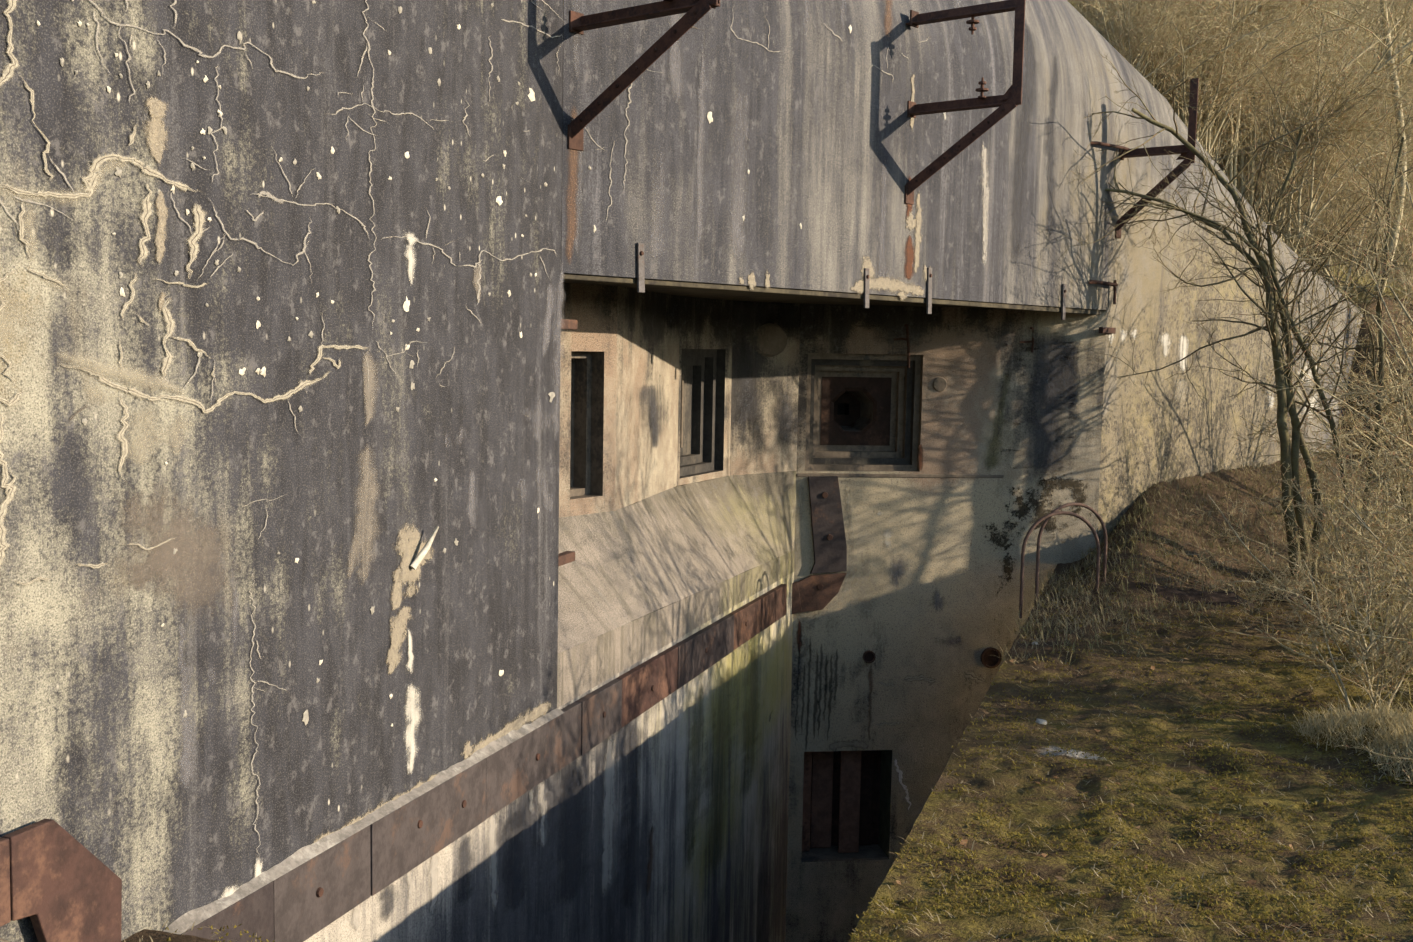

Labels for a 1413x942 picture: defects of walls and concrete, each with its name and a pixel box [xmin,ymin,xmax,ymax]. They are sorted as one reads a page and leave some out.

crack [0,0,564,480]
corrosion [568,149,578,258]
leakage [670,14,706,241]
corrosion [905,236,915,279]
leakage [1012,30,1036,262]
leakage [1047,58,1058,236]
crack [0,355,175,585]
crack [242,494,287,536]
leakage [641,386,661,446]
leakage [1026,334,1078,473]
spalling [386,523,433,674]
leakage [795,615,838,748]